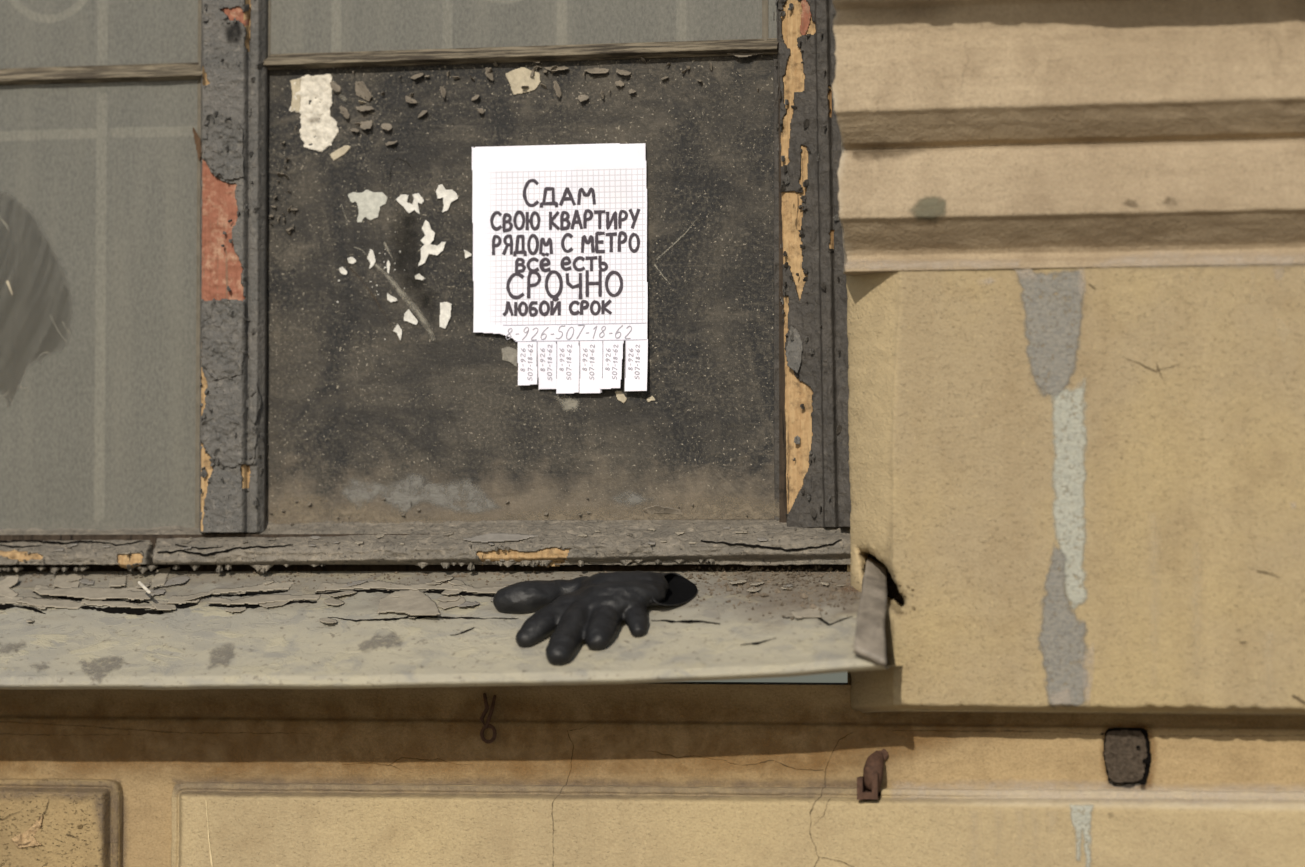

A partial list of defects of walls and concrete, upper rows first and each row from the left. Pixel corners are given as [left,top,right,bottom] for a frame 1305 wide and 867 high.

peeling [201,0,264,83]
peeling [290,79,301,130]
peeling [330,66,397,161]
peeling [399,61,636,118]
peeling [193,111,298,334]
peeling [727,0,840,530]
peeling [233,382,321,525]
peeling [0,543,215,622]
peeling [377,576,494,618]
spalling [868,554,915,613]
crack [653,733,854,867]